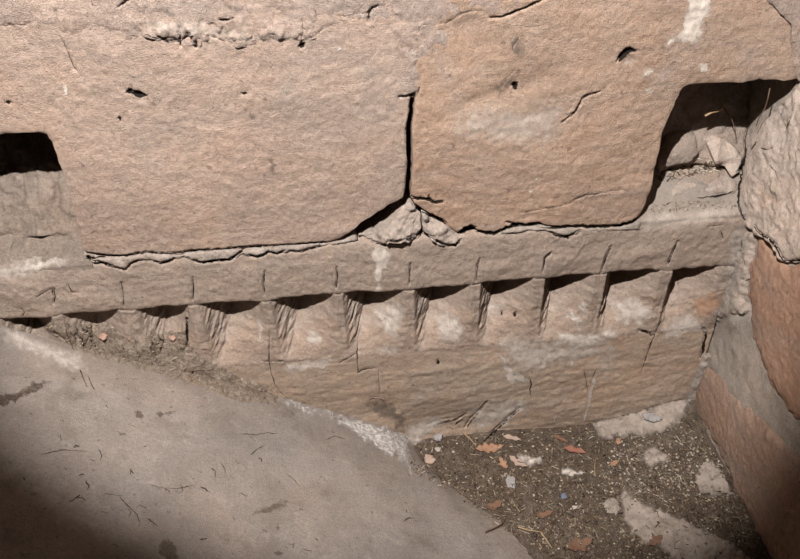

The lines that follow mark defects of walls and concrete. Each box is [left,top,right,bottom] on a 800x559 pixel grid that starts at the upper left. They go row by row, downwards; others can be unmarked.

crack [418,0,541,32]
damp [668,0,710,45]
crack [374,87,635,246]
crack [86,242,327,270]
damp [372,247,392,290]
crack [640,318,662,373]